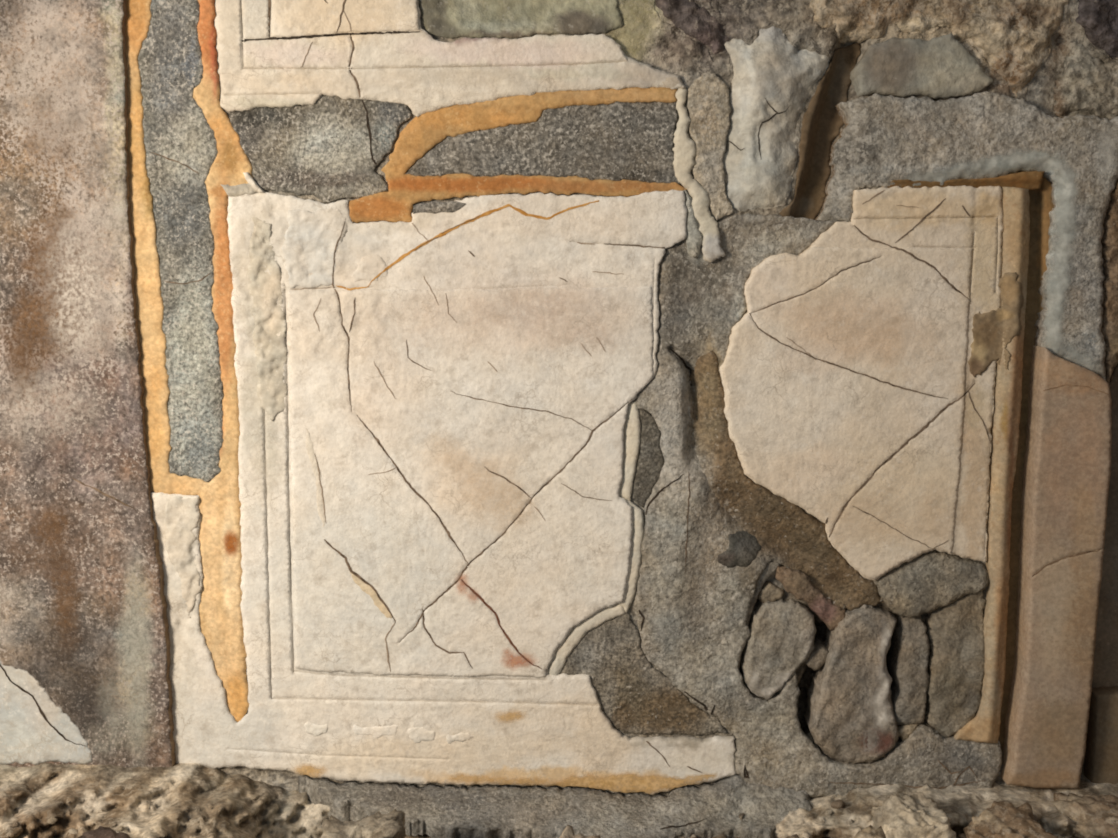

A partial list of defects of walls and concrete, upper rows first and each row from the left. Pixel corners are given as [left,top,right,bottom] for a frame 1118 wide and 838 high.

crack [577,241,665,249]
crack [749,190,991,549]
crack [292,200,632,672]
corrosion [226,535,237,553]
spalling [548,402,728,736]
spalling [718,530,762,568]
crack [1032,549,1101,577]
crack [0,665,85,746]